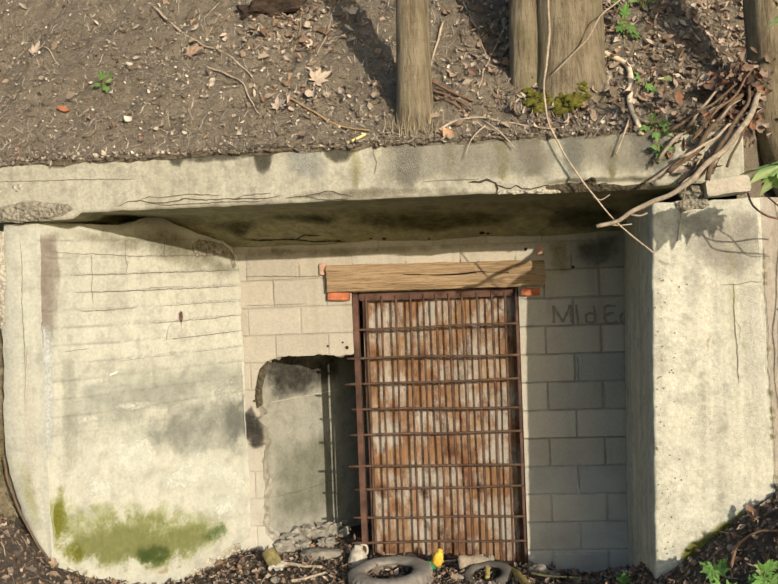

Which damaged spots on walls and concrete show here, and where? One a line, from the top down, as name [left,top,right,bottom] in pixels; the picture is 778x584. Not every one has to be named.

crack [2,176,129,184]
crack [119,191,352,206]
crack [426,178,550,194]
spalling [0,200,73,328]
spalling [192,239,236,268]
crack [58,243,310,361]
spalling [253,361,272,408]
crack [720,250,775,492]